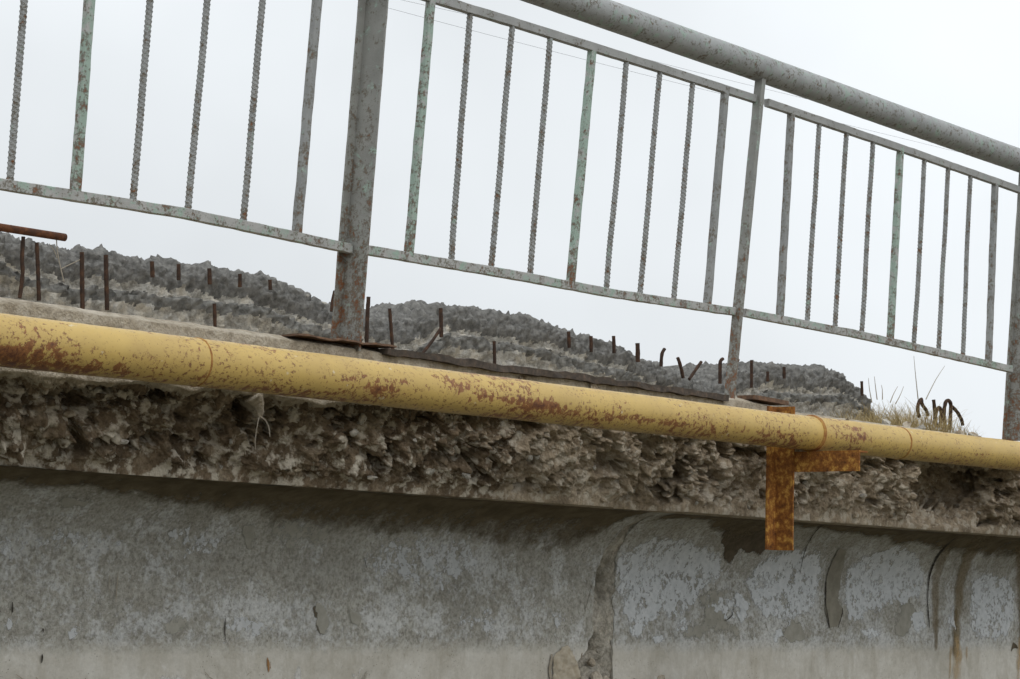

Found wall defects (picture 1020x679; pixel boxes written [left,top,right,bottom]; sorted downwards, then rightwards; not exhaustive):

spalling [422,308,443,353]
spalling [676,357,703,381]
spalling [915,397,964,429]
spalling [0,376,926,642]
spalling [794,455,1020,538]
crack [927,538,956,628]
spalling [549,645,581,679]